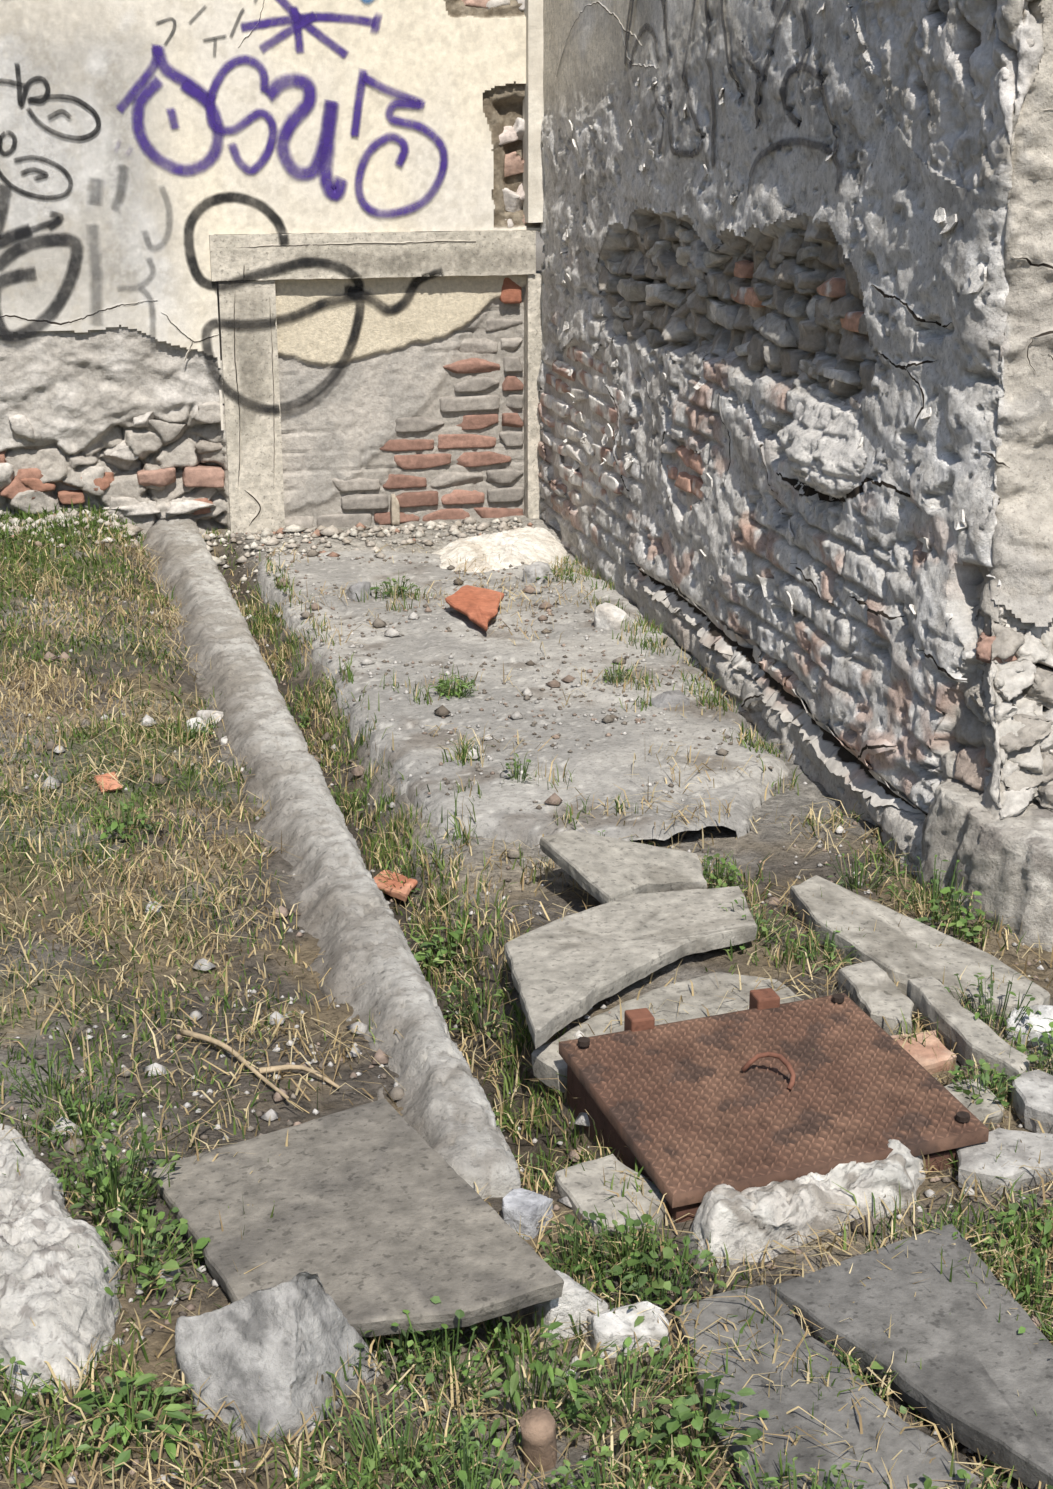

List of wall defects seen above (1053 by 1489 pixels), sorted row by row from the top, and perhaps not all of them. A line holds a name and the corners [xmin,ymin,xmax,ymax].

crack [239,0,265,47]
spalling [443,0,525,19]
spalling [483,81,541,233]
spalling [847,0,1045,192]
peeling [934,208,958,234]
crack [1011,256,1053,270]
spalling [0,325,230,536]
spalling [285,207,882,528]
crack [871,284,954,431]
crack [981,450,1010,468]
crack [1025,329,1053,375]
spalling [928,561,1053,820]